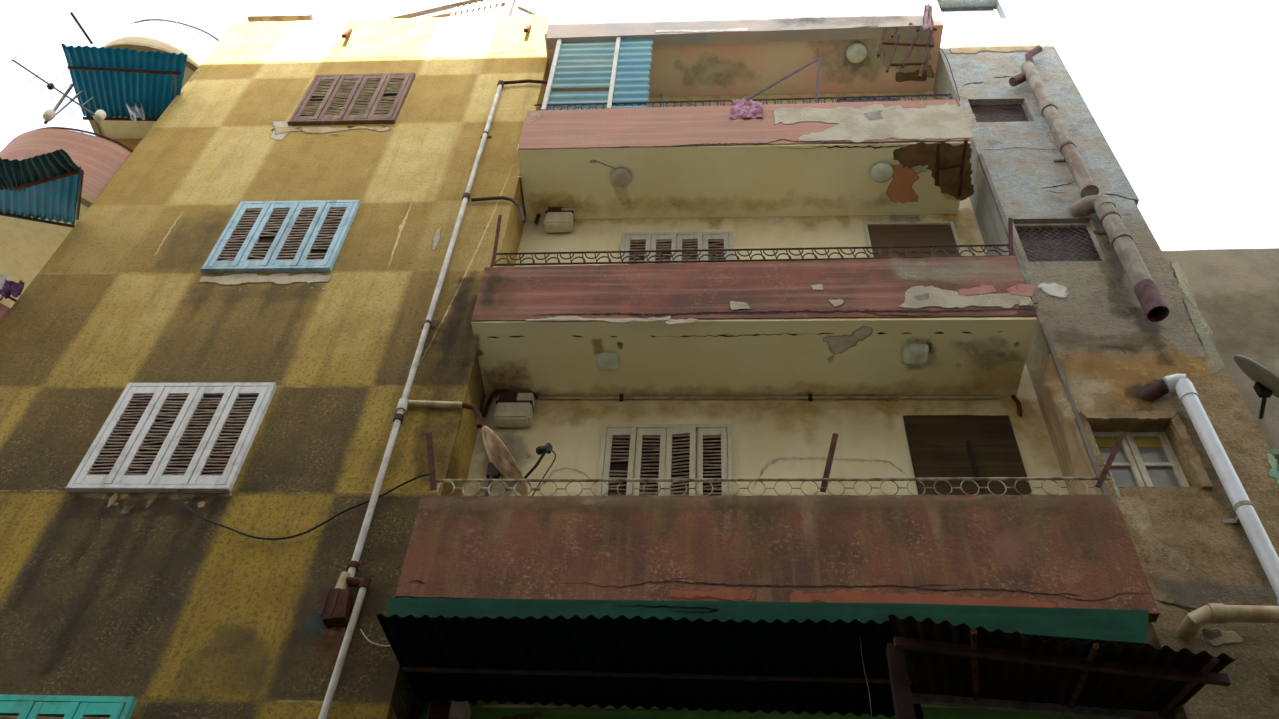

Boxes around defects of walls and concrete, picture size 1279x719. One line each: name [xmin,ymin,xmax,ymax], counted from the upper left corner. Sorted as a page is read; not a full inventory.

peeling [773,103,976,223]
peeling [899,282,1069,315]
spalling [823,326,872,354]
crack [562,578,1196,612]